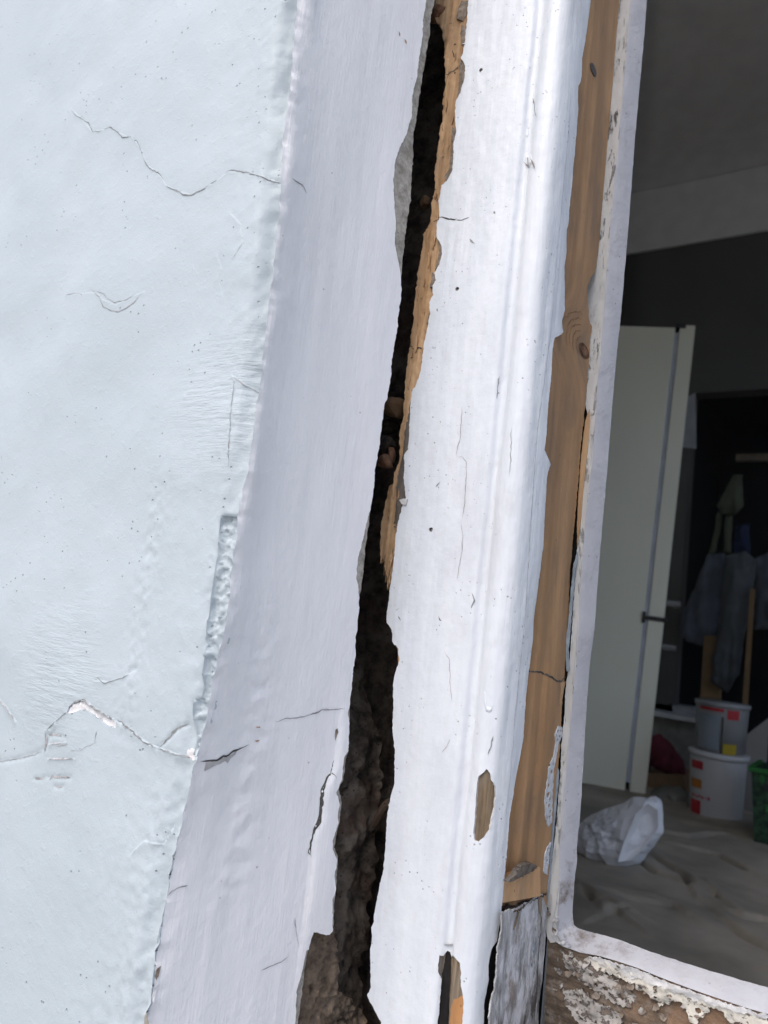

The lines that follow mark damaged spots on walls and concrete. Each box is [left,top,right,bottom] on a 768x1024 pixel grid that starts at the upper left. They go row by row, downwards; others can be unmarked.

peeling [456,1,468,44]
peeling [457,60,465,98]
crack [72,111,307,196]
spalling [393,0,435,275]
crack [71,290,139,312]
spalling [356,512,370,595]
crack [0,675,247,762]
crack [277,708,342,722]
crack [308,761,337,854]
peeling [475,769,495,841]
spalling [295,749,367,1024]
peeling [538,726,768,1024]